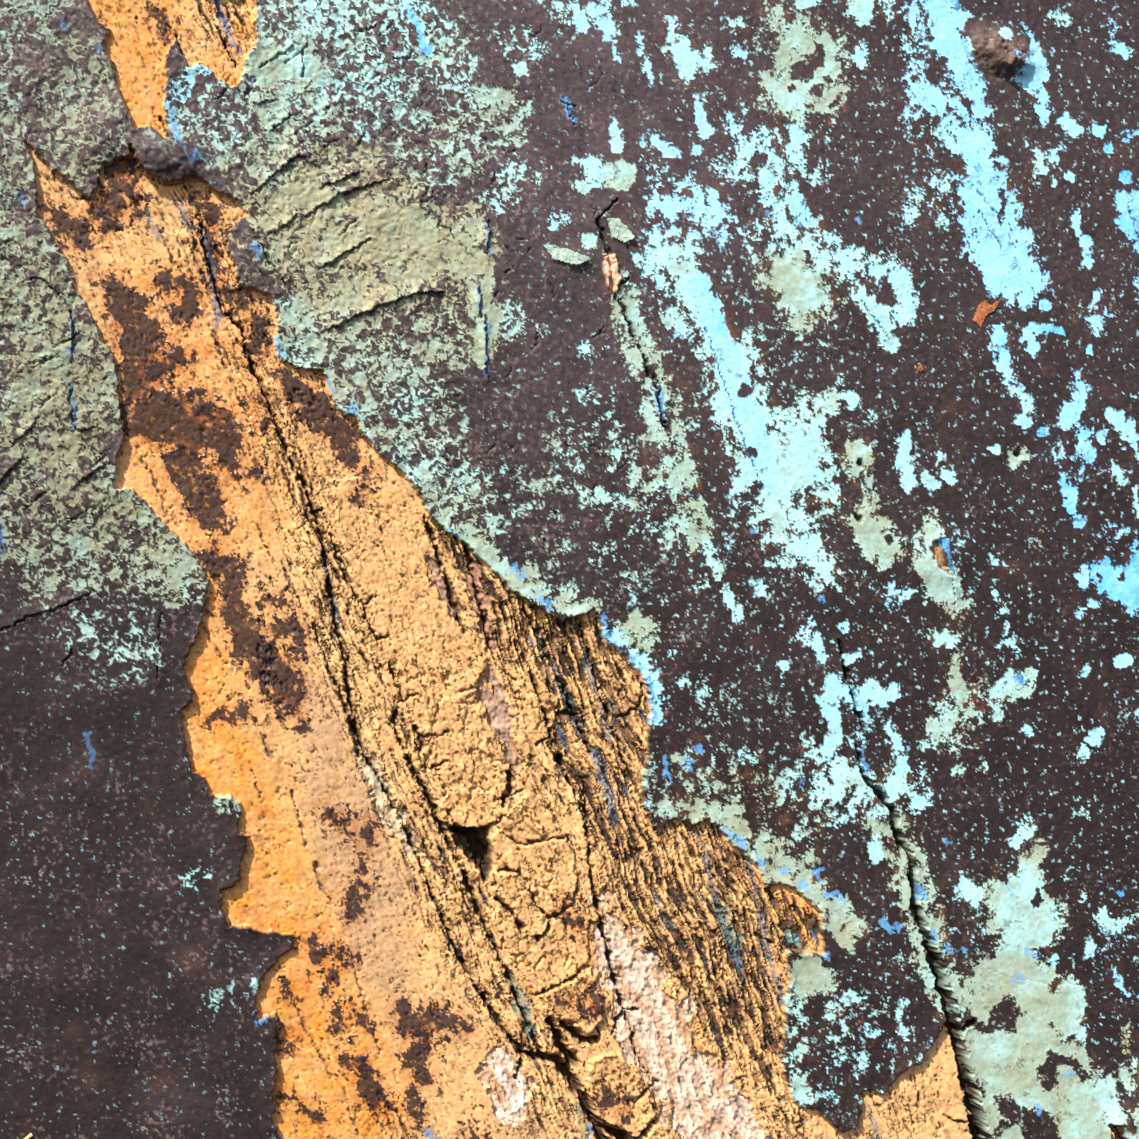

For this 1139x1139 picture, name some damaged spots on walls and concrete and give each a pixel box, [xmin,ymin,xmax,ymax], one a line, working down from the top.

peeling [0,0,596,1139]
crack [195,214,657,1139]
peeling [218,135,973,1139]
crack [595,198,675,447]
peeling [545,0,1139,777]
crack [838,640,1139,1139]
peeling [861,720,1139,1139]